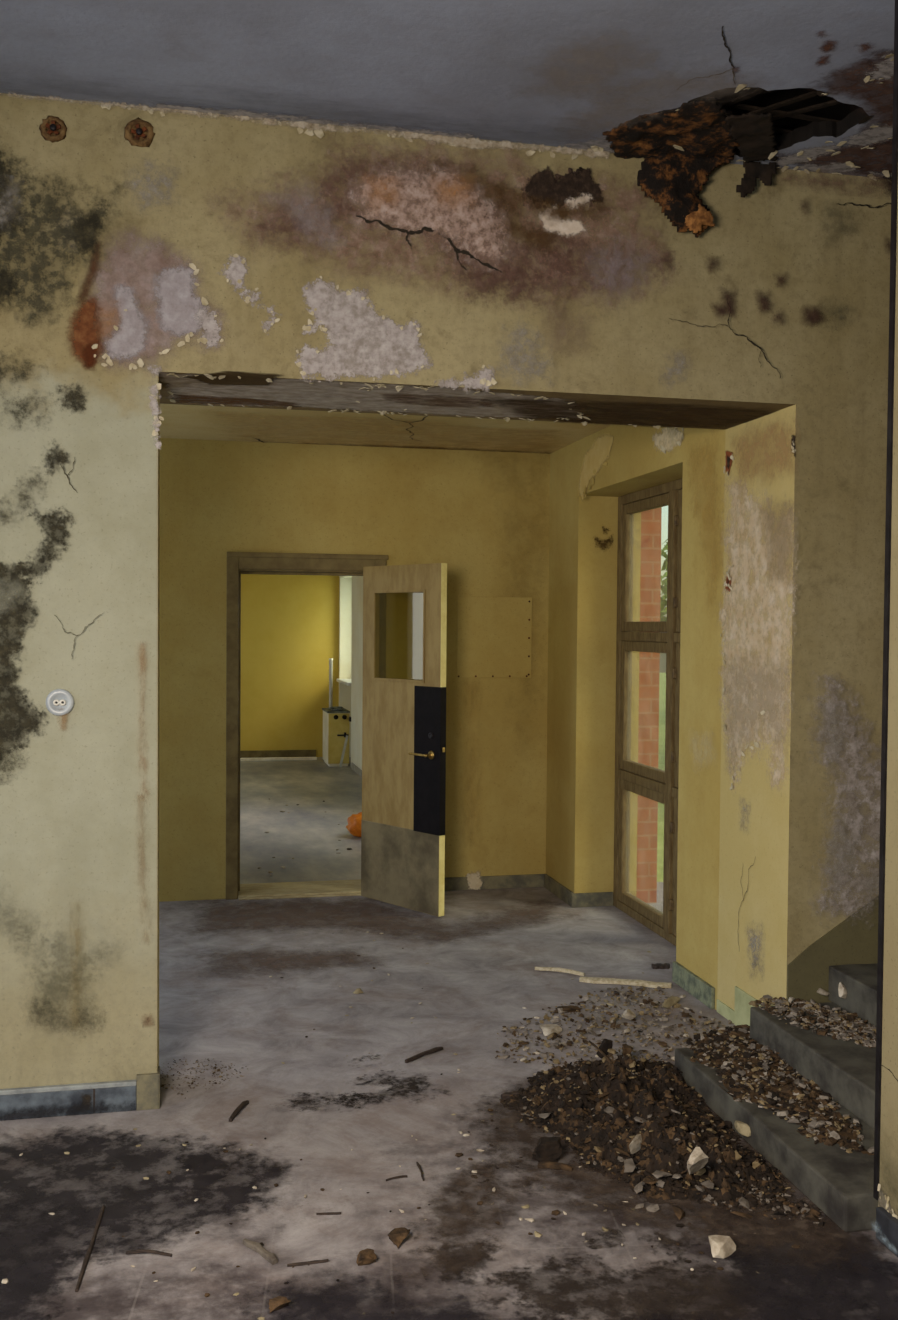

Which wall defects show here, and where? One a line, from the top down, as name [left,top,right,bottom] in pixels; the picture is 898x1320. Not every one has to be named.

flaking render [9,92,615,236]
leakage [0,152,117,324]
leakage [58,385,86,411]
corrosion [69,243,102,368]
flaking render [92,234,590,449]
crack [356,215,501,272]
peeling [579,435,613,499]
peeling [652,427,683,454]
crack [669,313,781,378]
leakage [0,446,73,780]
flaking render [720,426,796,790]
leakage [816,677,881,916]